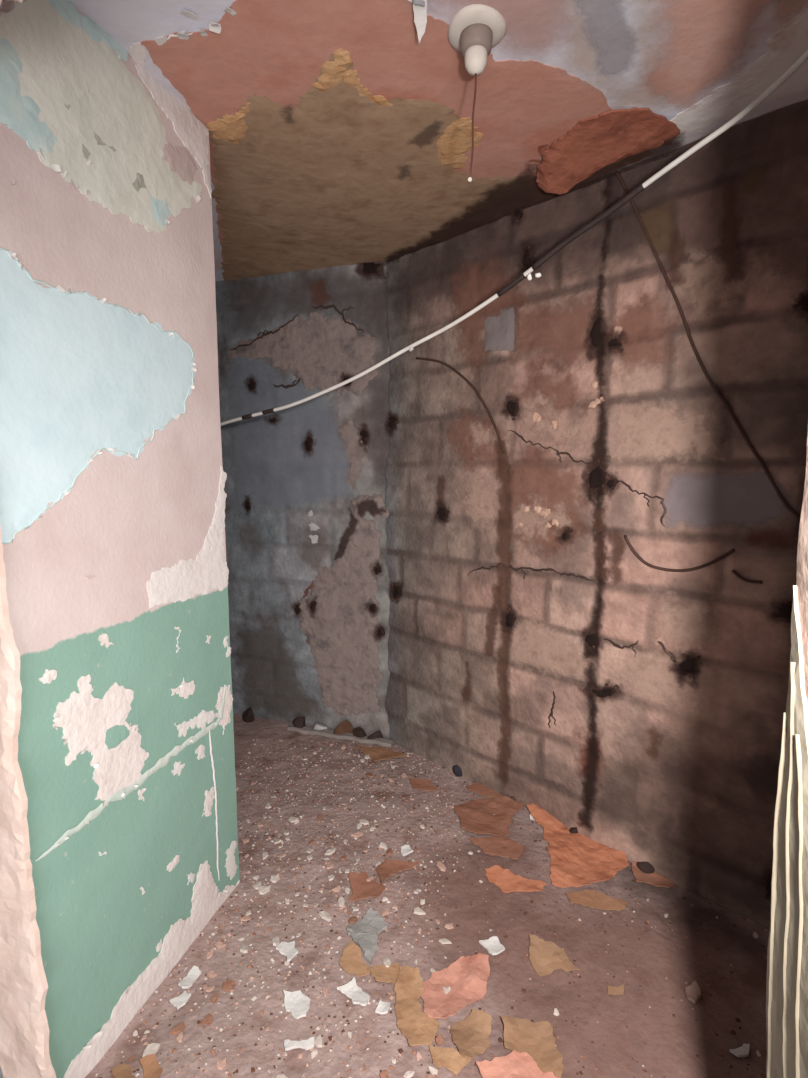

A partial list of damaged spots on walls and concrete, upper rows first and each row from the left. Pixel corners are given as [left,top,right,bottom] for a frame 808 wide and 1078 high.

leakage [624,0,771,105]
peeling [0,0,612,262]
crack [508,430,590,464]
leakage [592,351,607,463]
peeling [0,247,304,1078]
leakage [485,442,512,783]
crack [468,565,595,581]
spalling [512,502,574,542]
crack [548,691,556,728]
leakage [578,494,625,831]
spalling [501,604,717,709]
crack [618,480,667,527]